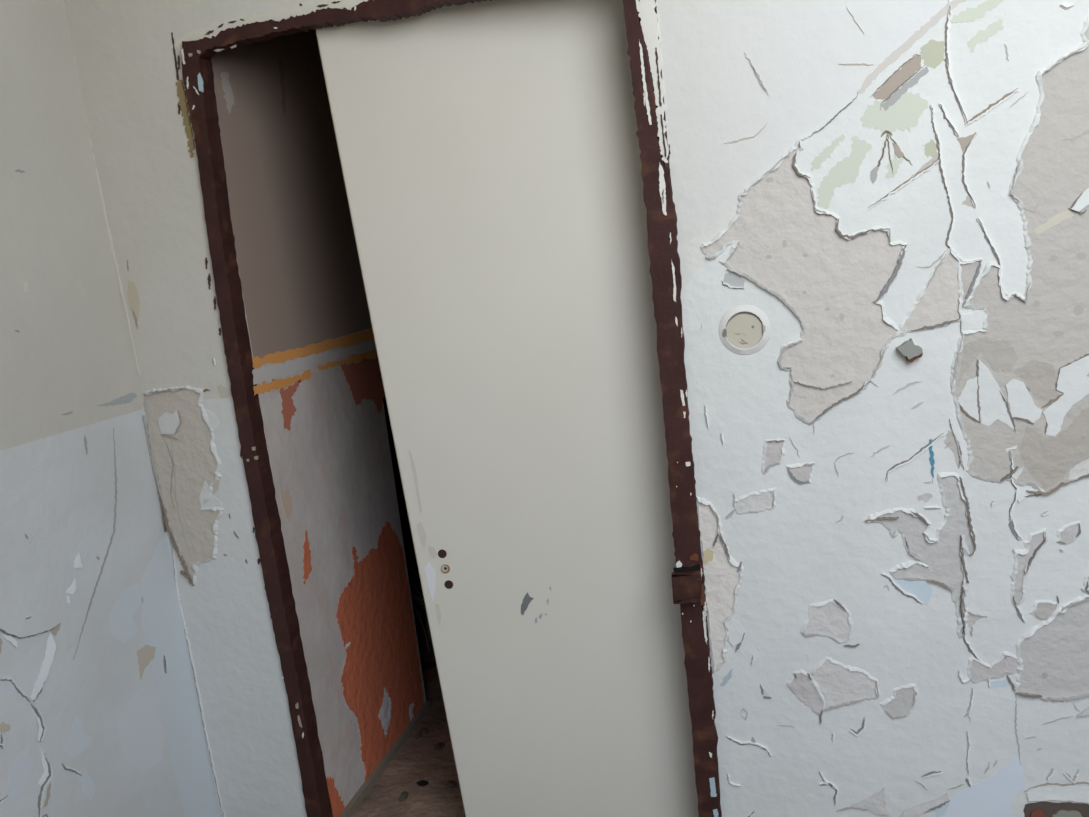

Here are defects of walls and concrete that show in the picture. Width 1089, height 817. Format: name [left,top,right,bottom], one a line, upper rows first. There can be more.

rust [176,80,195,158]
crack [806,0,1028,382]
peeling [252,340,385,431]
peeling [700,16,1089,638]
crack [73,428,117,660]
peeling [142,385,225,587]
peeling [336,521,424,782]
rust [690,549,714,565]
peeling [696,488,777,687]
peeling [786,657,919,725]
peeling [967,521,1089,717]
spalling [1023,785,1089,817]